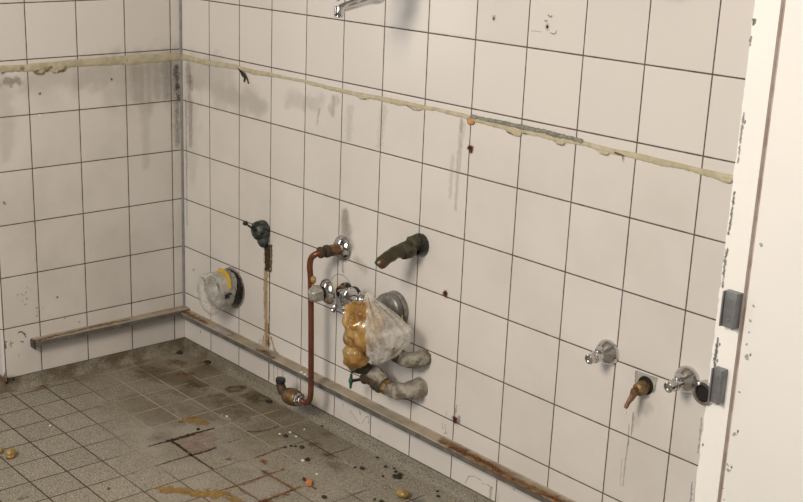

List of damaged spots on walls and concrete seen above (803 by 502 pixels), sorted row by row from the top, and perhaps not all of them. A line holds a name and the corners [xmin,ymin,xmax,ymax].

corrosion [256,245,279,359]
corrosion [438,439,566,502]